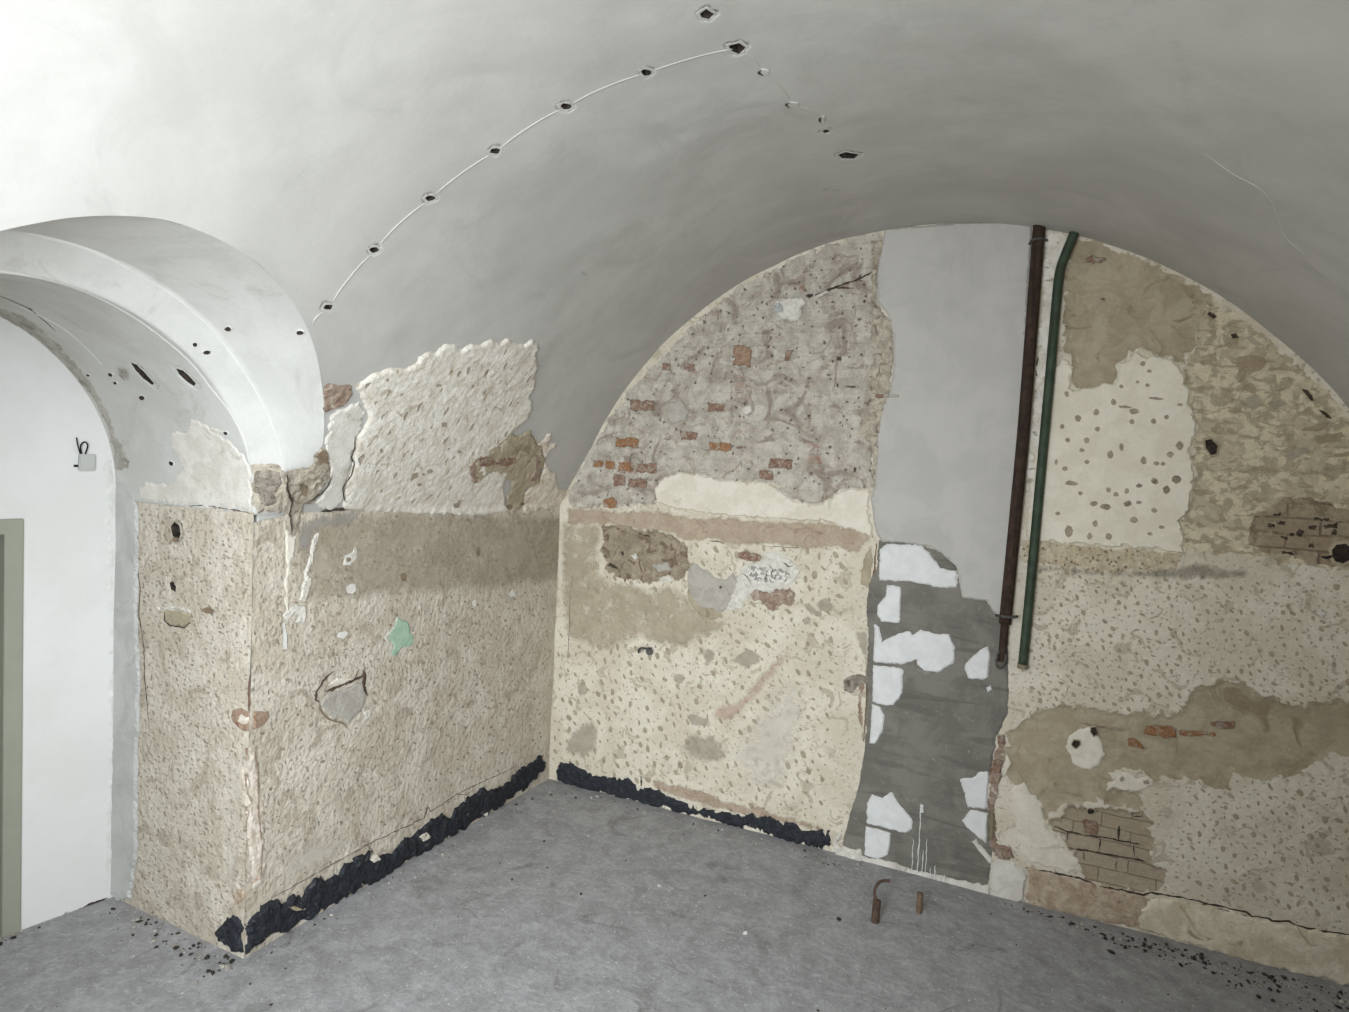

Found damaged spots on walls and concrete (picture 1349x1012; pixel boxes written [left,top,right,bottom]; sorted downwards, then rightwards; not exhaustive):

flaking render [251,232,899,535]
flaking render [1021,231,1349,575]
flaking render [282,532,320,624]
flaking render [343,546,357,566]
flaking render [600,524,690,584]
flaking render [719,551,831,624]
flaking render [735,650,759,666]
flaking render [688,715,708,725]
flaking render [832,540,1349,929]
crack [1025,867,1349,935]